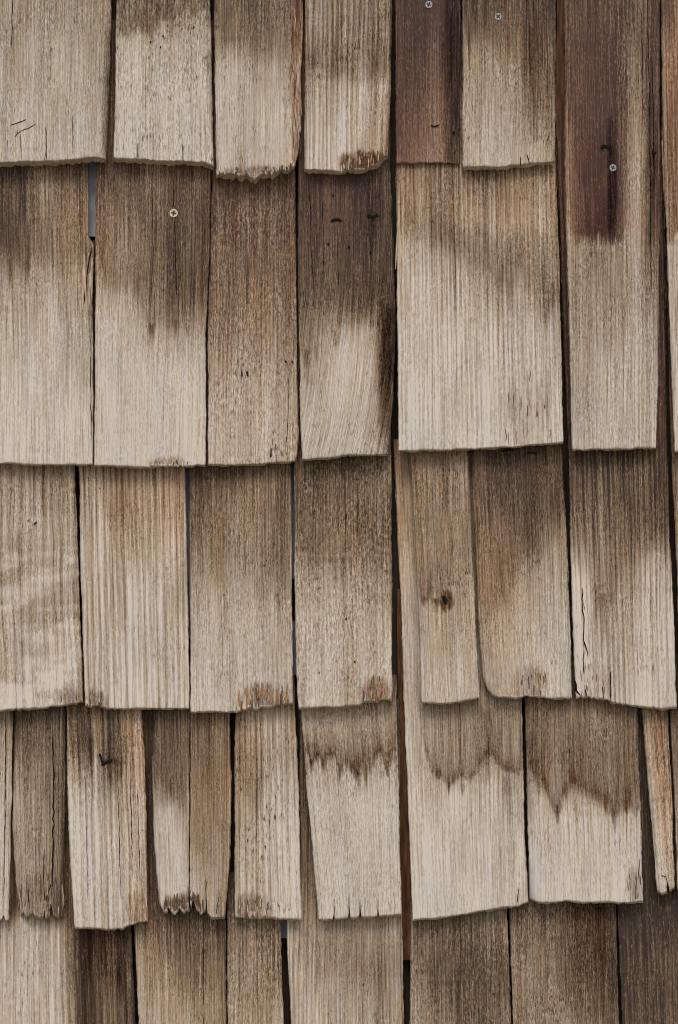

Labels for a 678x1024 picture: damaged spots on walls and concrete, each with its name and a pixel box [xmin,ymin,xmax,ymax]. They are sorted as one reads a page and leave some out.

leakage [307,744,393,782]
leakage [557,764,632,816]